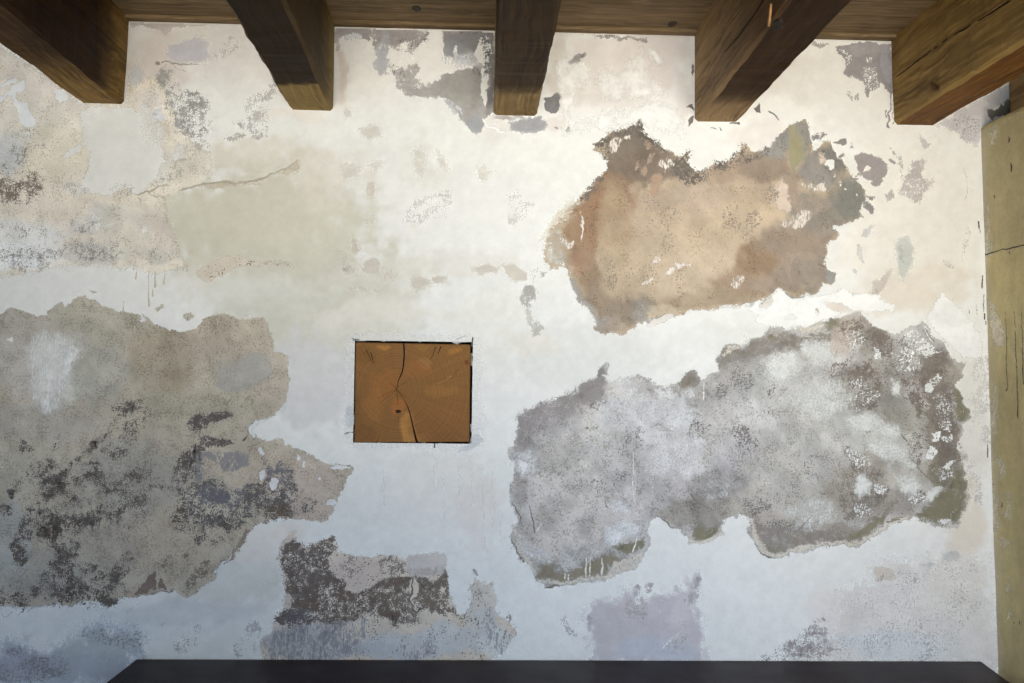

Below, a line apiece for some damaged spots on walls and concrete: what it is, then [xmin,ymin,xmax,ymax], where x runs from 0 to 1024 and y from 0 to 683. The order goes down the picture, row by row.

peeling [334,28,570,135]
crack [134,160,300,201]
flaking render [0,290,354,612]
peeling [260,535,516,660]